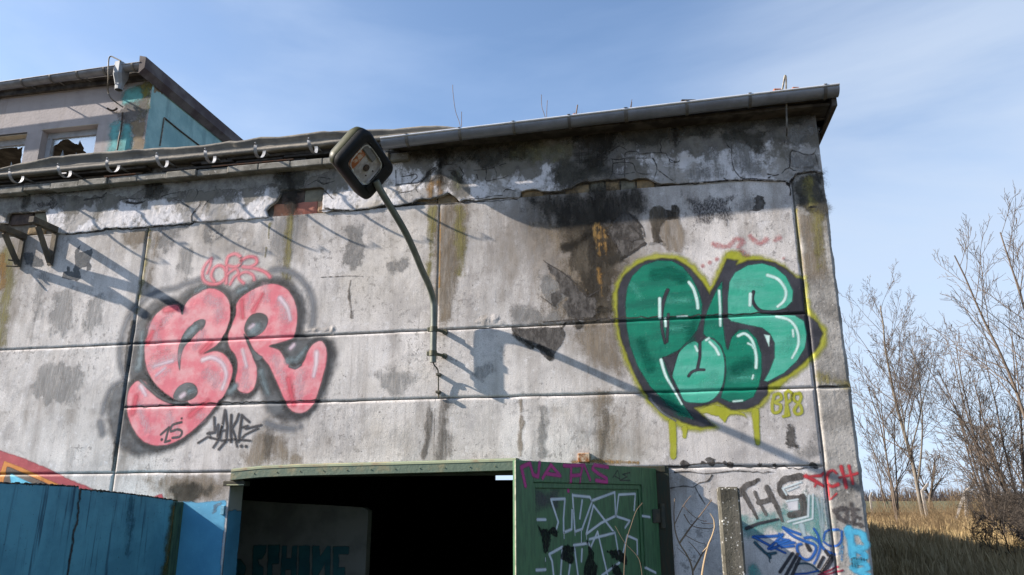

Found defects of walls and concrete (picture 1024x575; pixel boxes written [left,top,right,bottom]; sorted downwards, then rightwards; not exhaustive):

crack [611,141,824,196]
spalling [268,188,324,217]
spalling [413,194,468,206]
spalling [521,179,663,197]
rust [593,222,607,254]